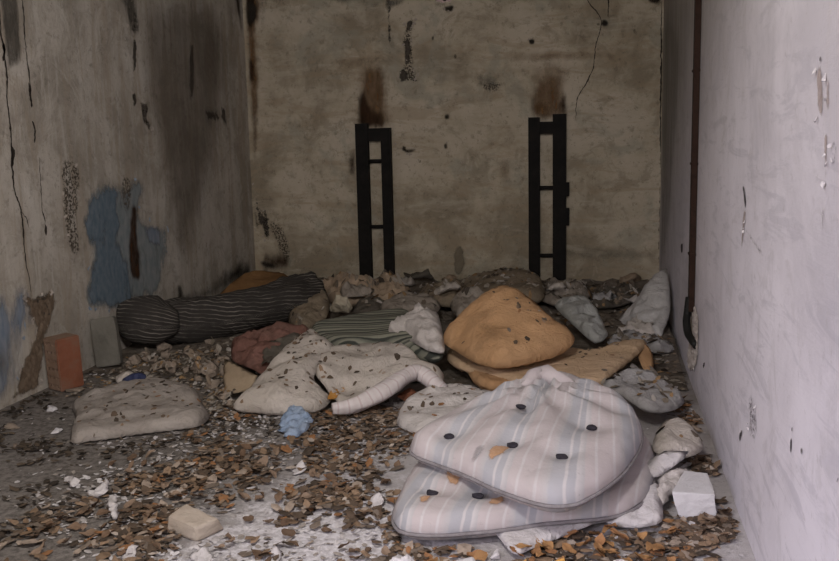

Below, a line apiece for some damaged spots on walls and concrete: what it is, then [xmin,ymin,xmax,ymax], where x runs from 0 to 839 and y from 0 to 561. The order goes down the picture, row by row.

damp [1,0,20,65]
corrosion [360,69,385,126]
corrosion [535,78,565,116]
crack [575,0,609,119]
peeling [61,162,169,312]
spalling [0,289,55,398]